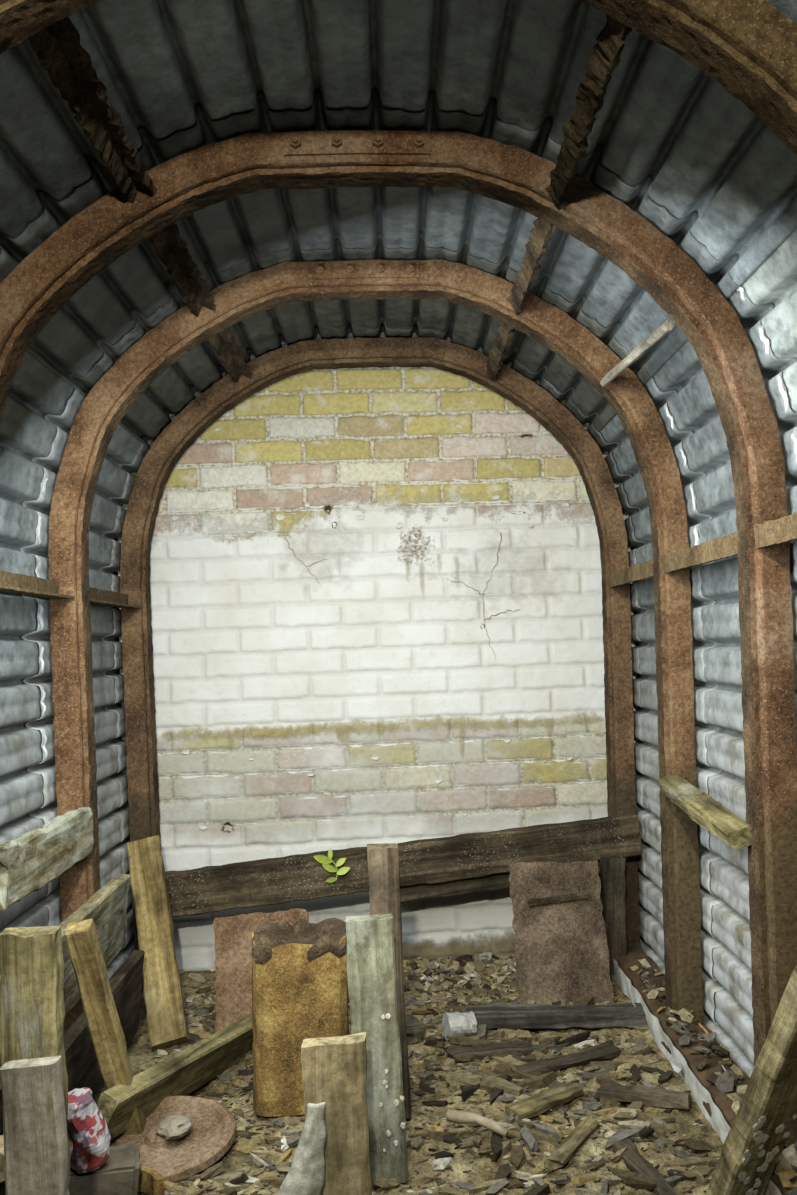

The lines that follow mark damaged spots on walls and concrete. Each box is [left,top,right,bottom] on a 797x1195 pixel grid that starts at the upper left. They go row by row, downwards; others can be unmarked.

peeling [153,367,593,541]
peeling [157,720,607,833]